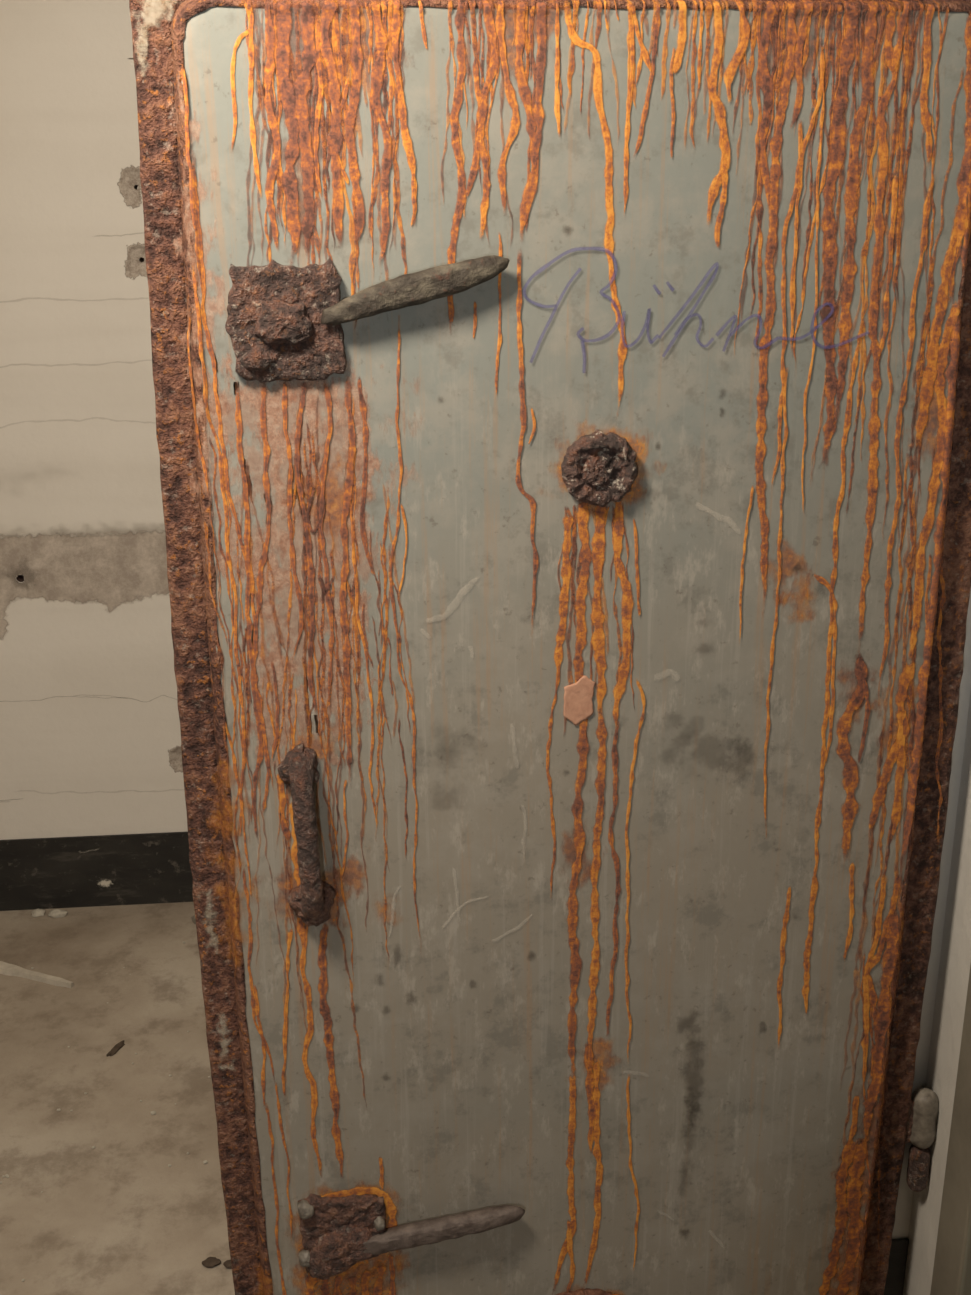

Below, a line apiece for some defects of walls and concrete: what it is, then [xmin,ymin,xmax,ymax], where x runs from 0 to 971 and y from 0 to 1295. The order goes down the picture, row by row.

rust [230,0,417,296]
rust [418,1,427,49]
peeling [0,531,169,638]
rust [181,68,420,1295]
rust [447,0,971,1295]